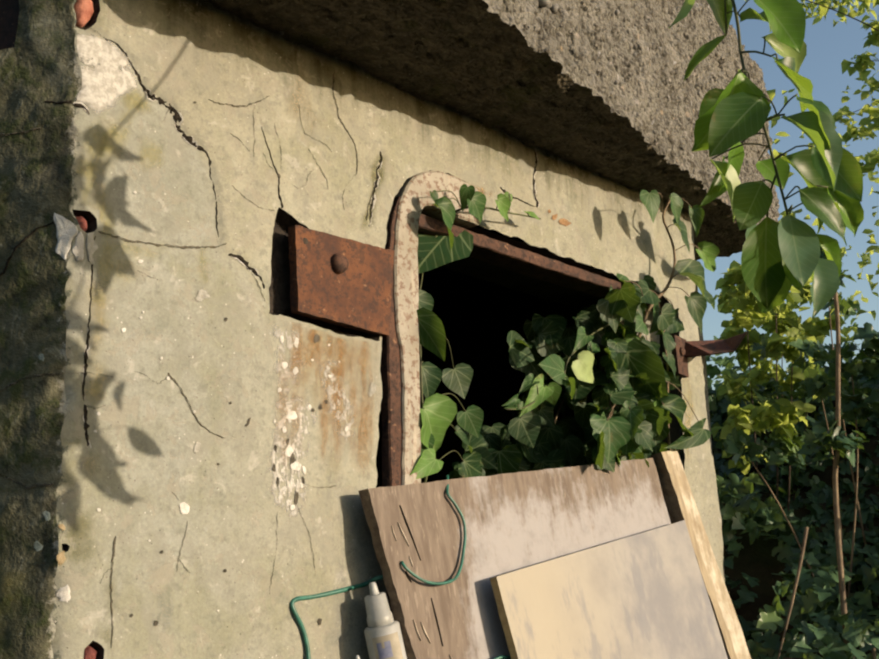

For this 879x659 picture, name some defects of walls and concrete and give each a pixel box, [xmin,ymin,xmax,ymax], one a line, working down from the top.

crack [94,37,269,289]
crack [262,130,284,208]
crack [332,72,383,227]
crack [0,221,54,276]
spalling [269,208,380,346]
crack [82,264,93,448]
crack [168,373,223,438]
peeling [271,328,354,516]